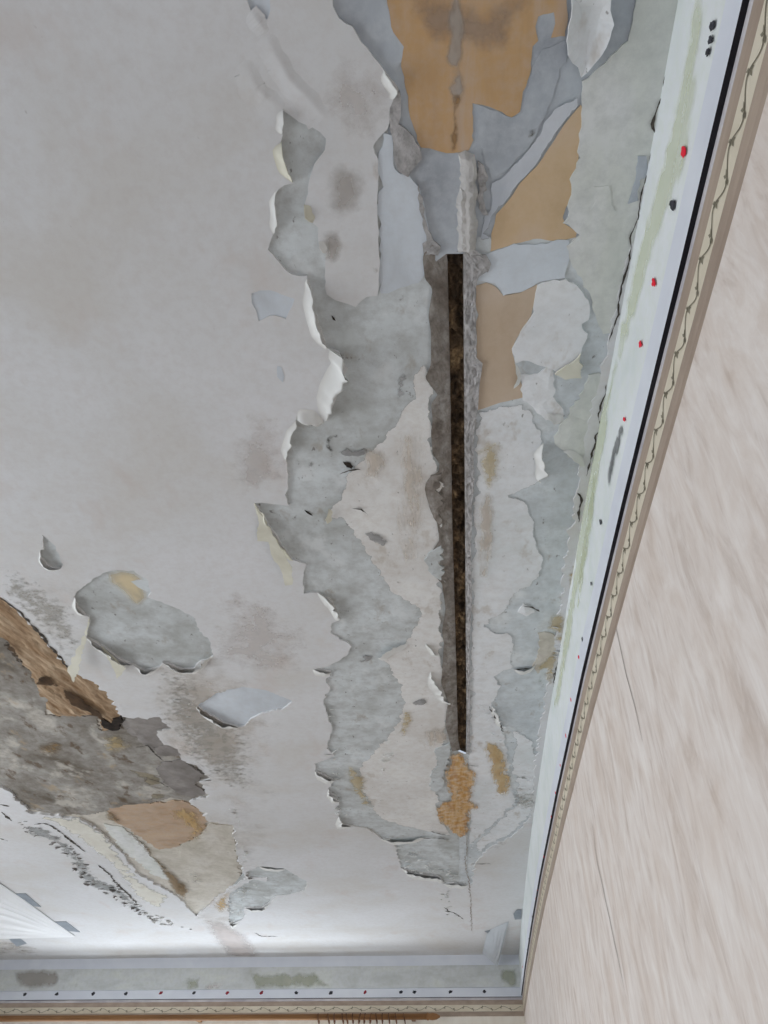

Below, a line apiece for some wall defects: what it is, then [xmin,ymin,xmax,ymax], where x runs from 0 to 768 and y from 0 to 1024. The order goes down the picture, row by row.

crack [609,77,665,340]
peeling [254,0,678,916]
crack [577,386,606,521]
peeling [38,537,63,571]
spalling [0,570,307,930]
corrosion [437,754,478,837]
corrosion [487,743,510,793]